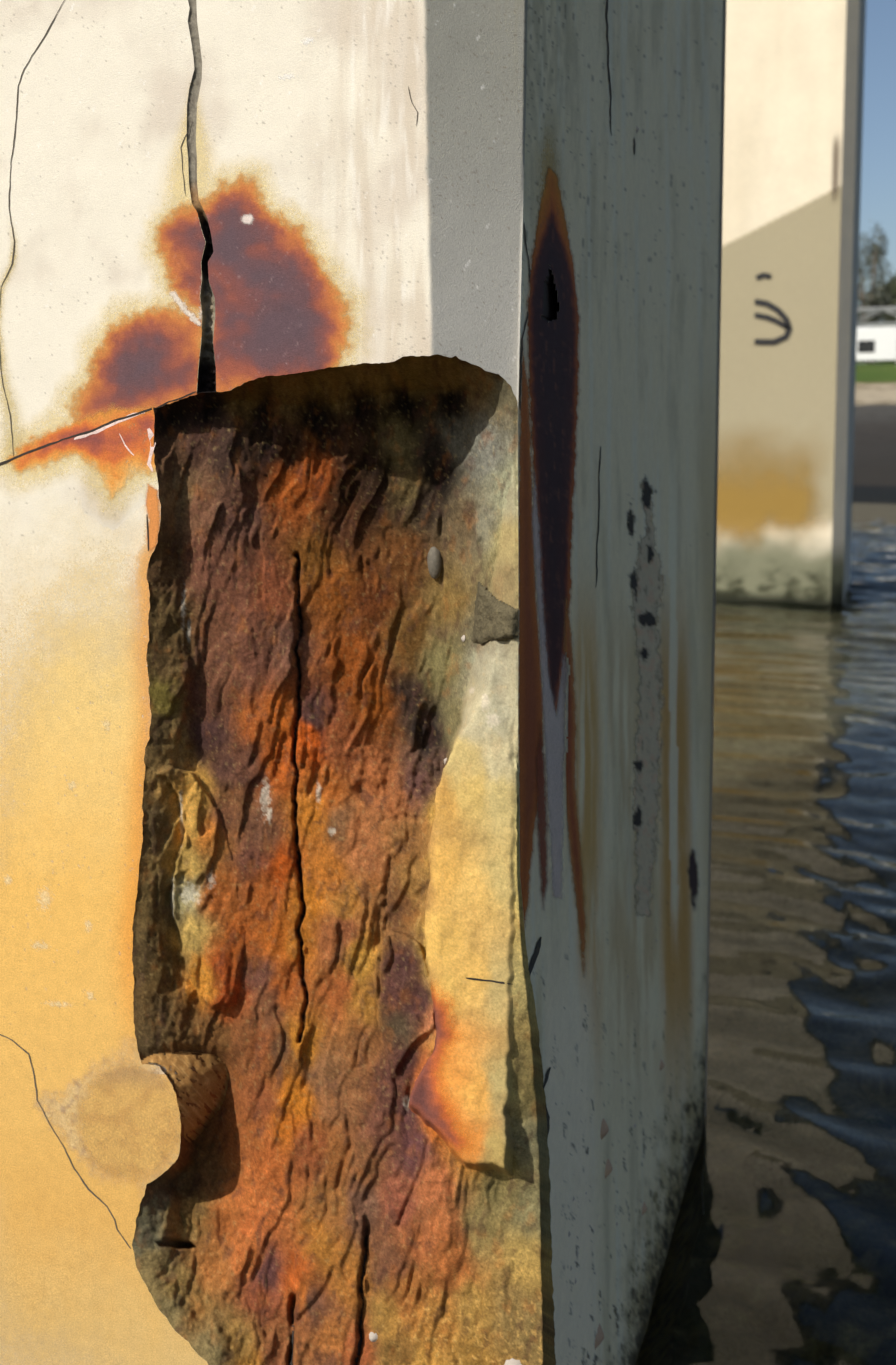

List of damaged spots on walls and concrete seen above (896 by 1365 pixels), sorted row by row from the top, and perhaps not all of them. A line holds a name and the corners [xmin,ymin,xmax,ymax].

crack [0,0,216,472]
corrosion [8,174,352,498]
corrosion [519,145,586,967]
crack [0,1034,131,1249]
spalling [132,354,556,1365]
corrosion [409,987,469,1154]